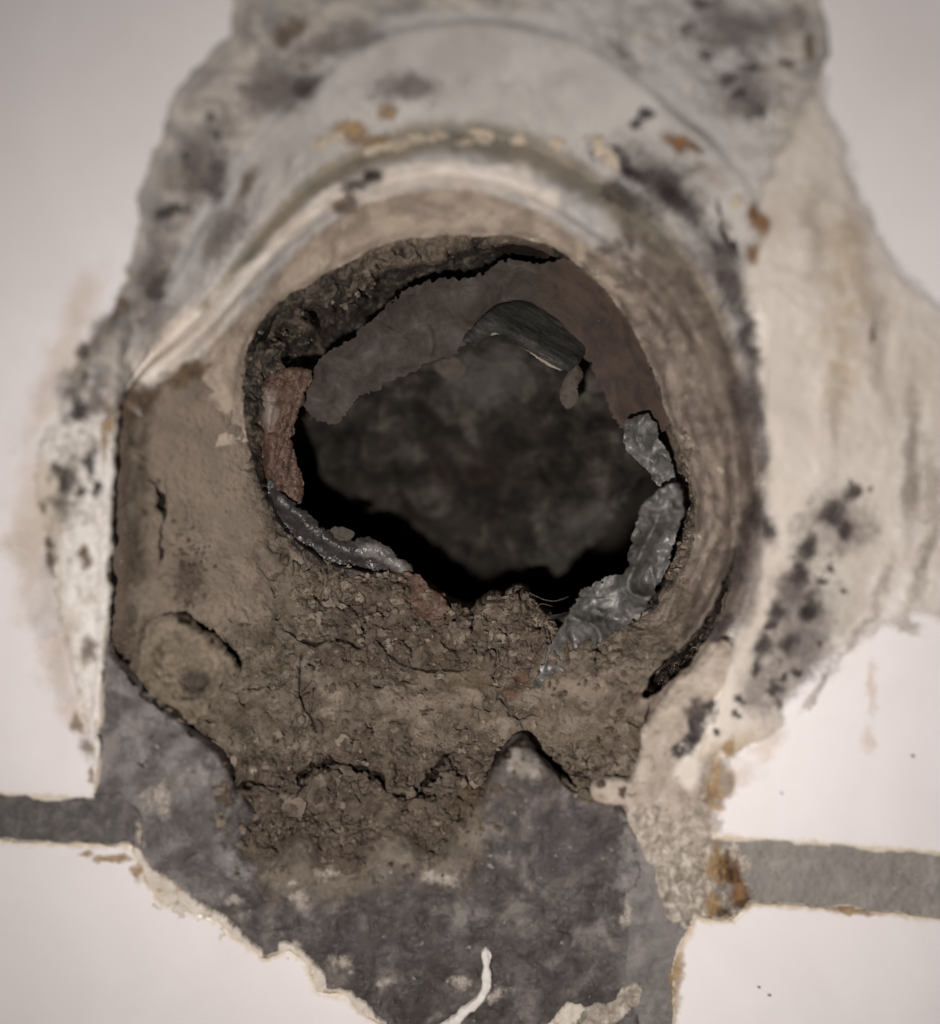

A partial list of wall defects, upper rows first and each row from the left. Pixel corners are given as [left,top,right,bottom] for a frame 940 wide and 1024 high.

water stain [629,107,656,129]
water stain [333,170,382,212]
water stain [35,248,175,766]
water stain [818,479,872,542]
water stain [752,534,832,709]
crack [274,627,462,801]
flaking render [590,638,752,933]
spalling [134,847,263,958]
rust [706,848,751,918]
spalling [278,940,384,1024]
peeling [440,947,492,1024]
spalling [548,982,643,1024]